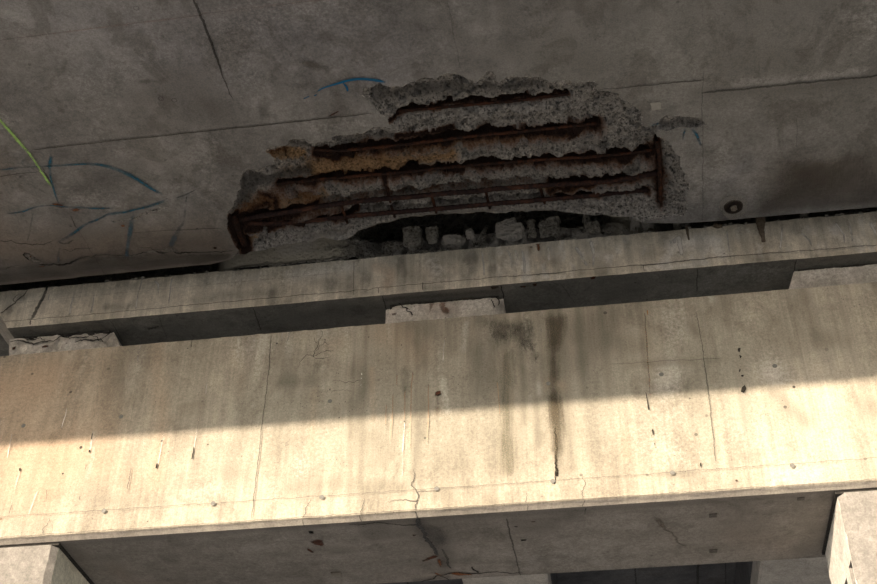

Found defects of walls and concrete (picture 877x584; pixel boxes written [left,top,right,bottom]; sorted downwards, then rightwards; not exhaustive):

spalling [227,71,708,255]
crack [1,216,876,345]
damp [548,316,564,455]
crack [349,475,522,582]